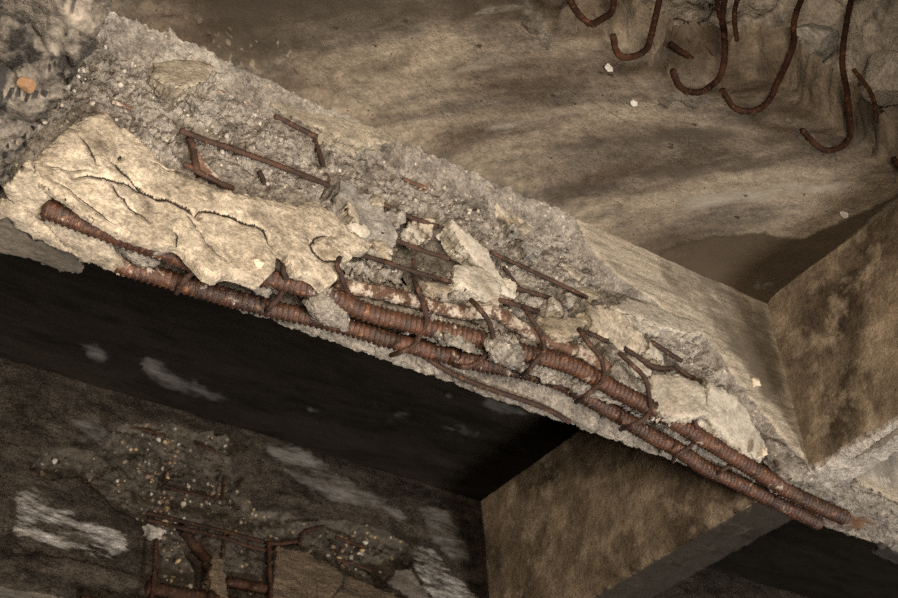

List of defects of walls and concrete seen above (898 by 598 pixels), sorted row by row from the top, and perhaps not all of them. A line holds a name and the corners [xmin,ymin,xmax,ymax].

spalling [784,0,879,161]
crack [46,137,269,258]
spalling [0,0,821,488]
spalling [0,422,430,598]
spalling [658,418,858,530]
spalling [799,480,898,552]
spalling [807,416,898,490]